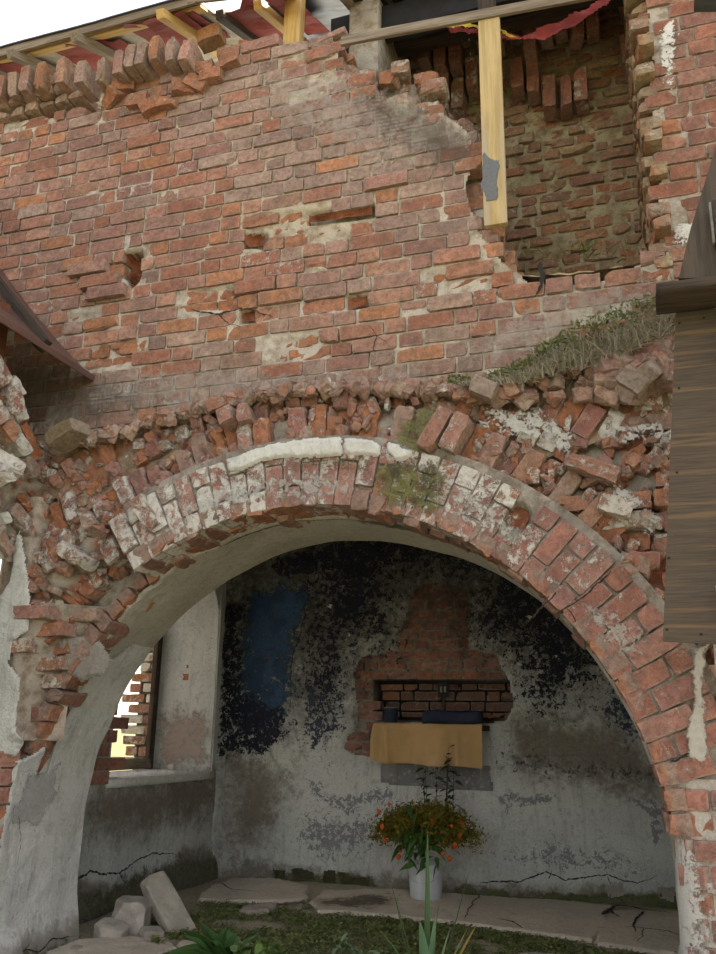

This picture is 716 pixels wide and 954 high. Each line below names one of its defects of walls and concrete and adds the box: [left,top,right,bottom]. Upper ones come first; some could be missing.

spalling [63,315,119,336]
spalling [85,340,146,370]
spalling [280,327,352,362]
spalling [0,355,673,688]
peeling [216,541,656,886]
damp [512,714,654,791]
flaking render [0,741,32,848]
crack [78,852,173,885]
crack [465,871,678,941]